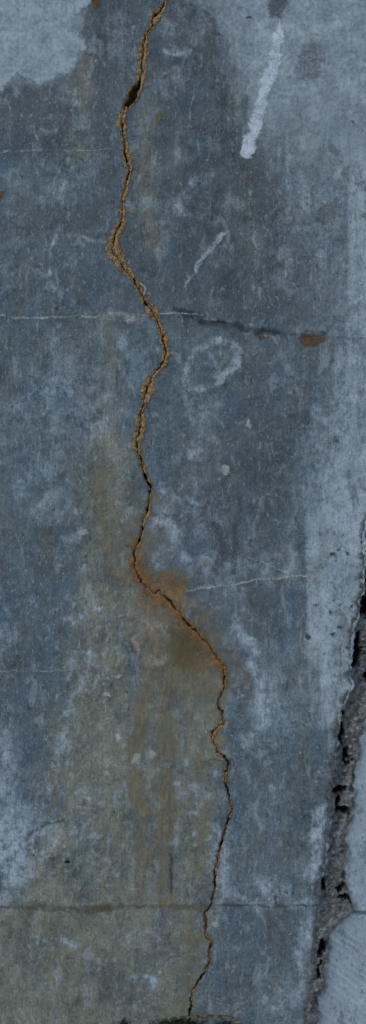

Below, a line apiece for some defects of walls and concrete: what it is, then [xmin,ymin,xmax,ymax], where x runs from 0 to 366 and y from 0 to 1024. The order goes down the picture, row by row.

crack [0,0,285,1016]
corrosion [123,498,235,700]
spalling [303,515,366,1024]